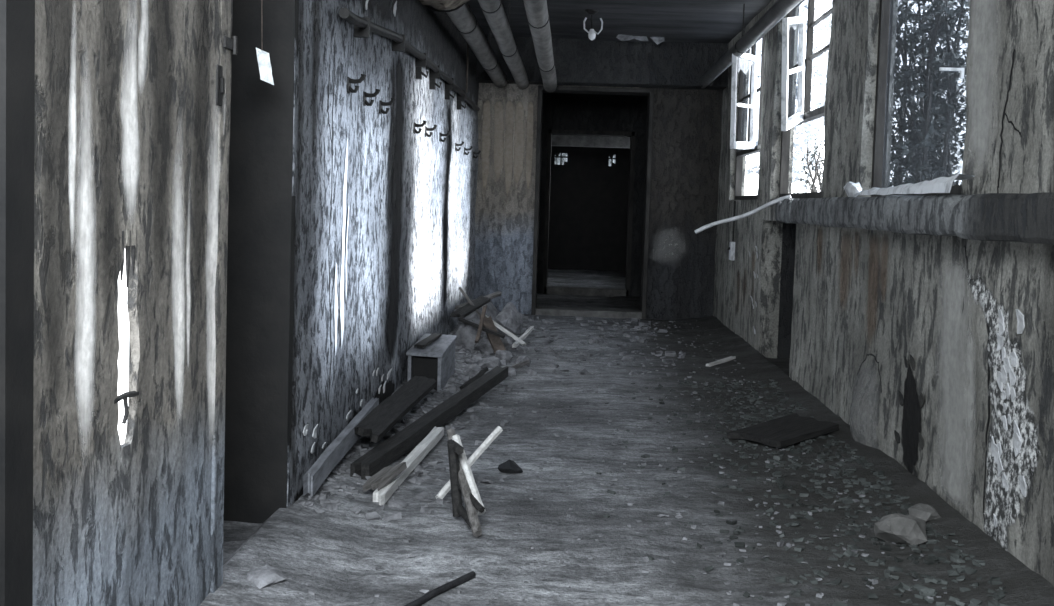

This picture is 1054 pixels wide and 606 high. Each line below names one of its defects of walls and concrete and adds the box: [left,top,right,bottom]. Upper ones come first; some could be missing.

flaking render [968,276,1040,550]